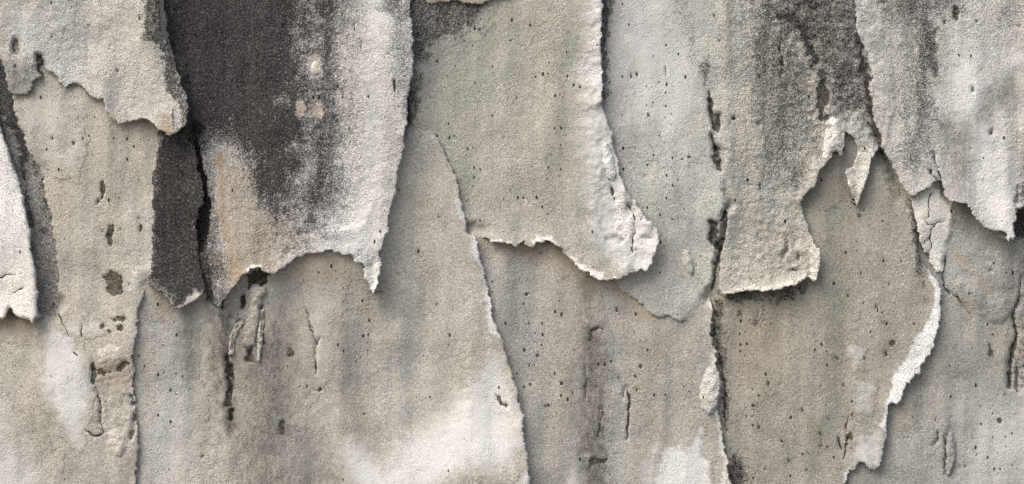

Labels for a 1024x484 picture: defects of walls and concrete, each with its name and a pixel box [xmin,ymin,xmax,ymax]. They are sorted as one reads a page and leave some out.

peeling [0,0,193,484]
peeling [189,187,318,484]
water stain [134,0,529,484]
peeling [341,0,967,484]
crack [711,294,731,430]
water stain [556,0,1024,484]
peeling [942,5,985,45]
peeling [988,97,1024,139]